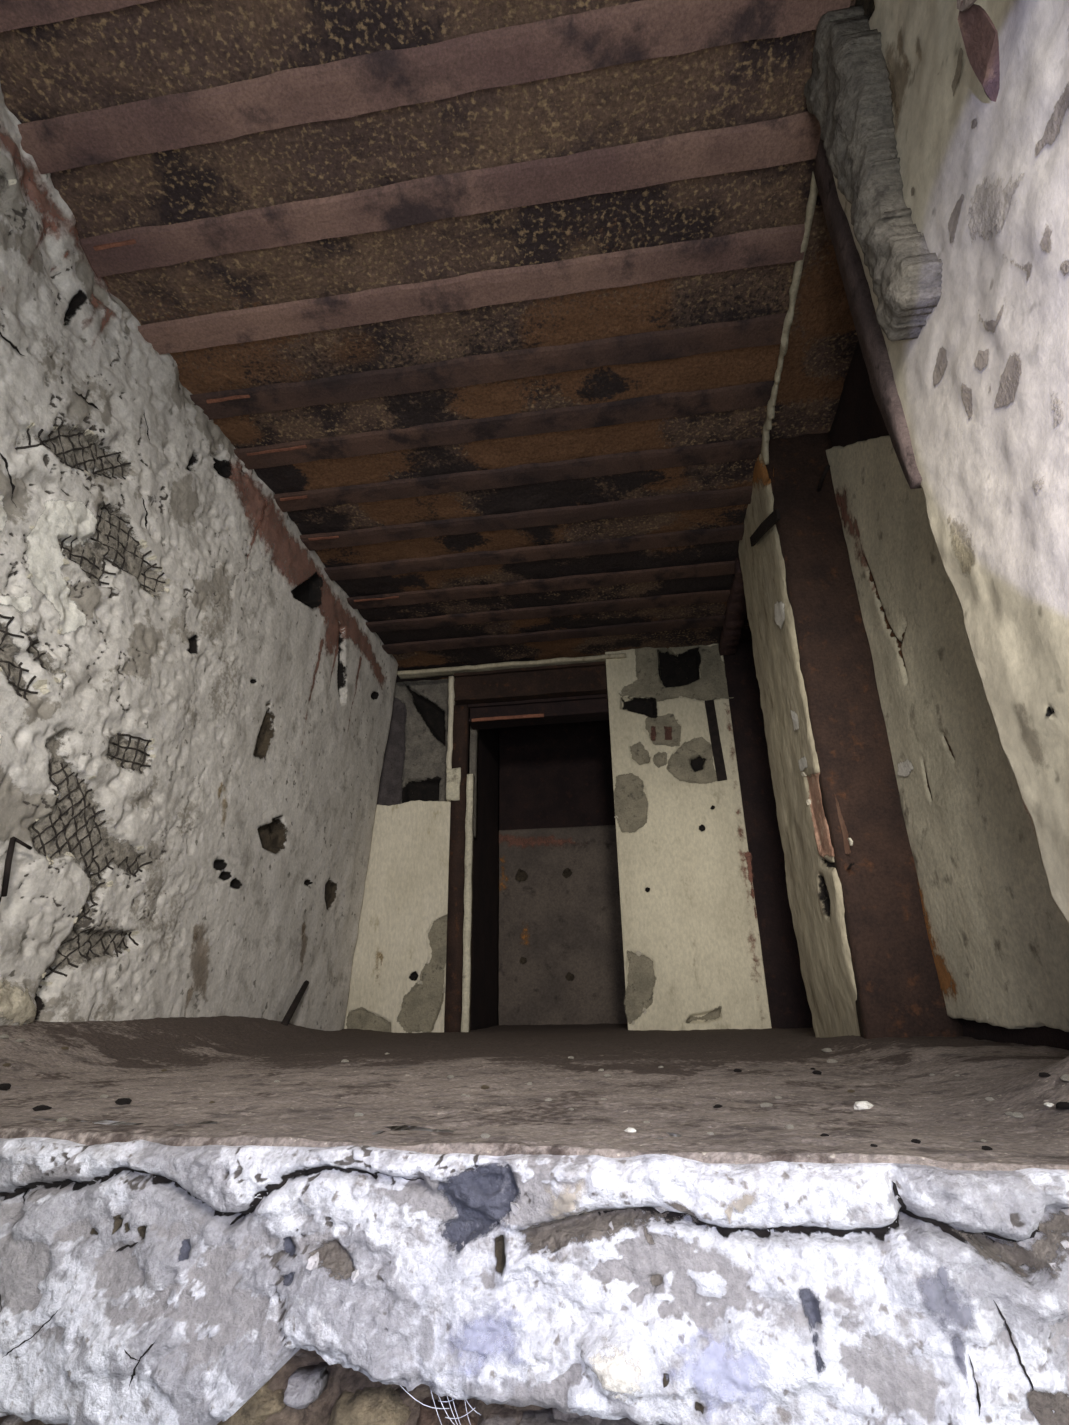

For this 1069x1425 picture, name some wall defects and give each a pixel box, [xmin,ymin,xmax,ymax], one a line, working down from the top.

spalling [15,422,132,480]
peeling [0,500,170,701]
corrosion [229,445,399,729]
corrosion [835,488,877,590]
spalling [614,644,734,833]
spalling [28,727,156,996]
corrosion [918,882,956,999]
crack [0,1166,424,1225]
spalling [436,1163,712,1254]
crack [562,1181,1040,1266]
crack [968,1354,981,1415]
crack [993,1300,1034,1391]